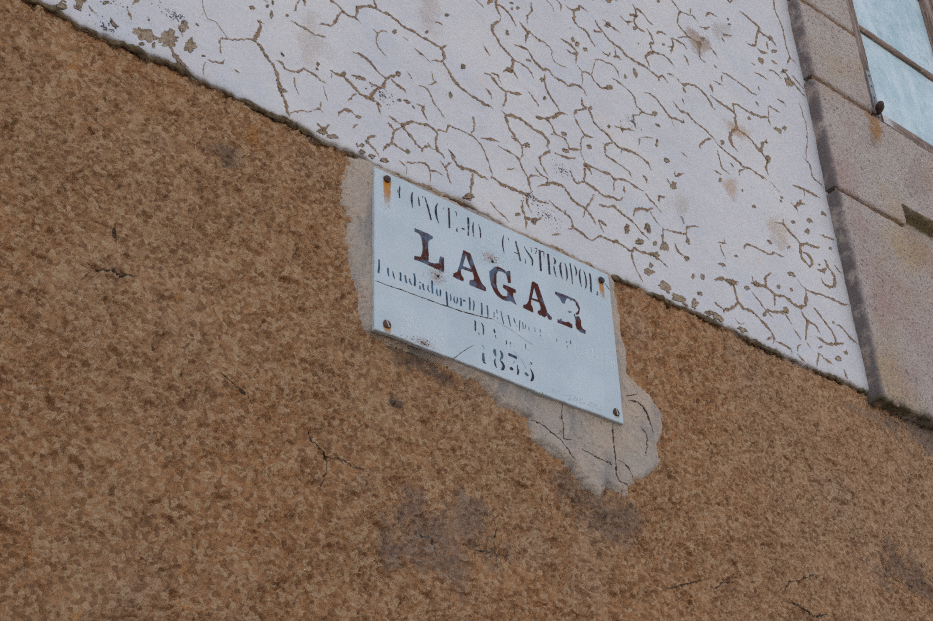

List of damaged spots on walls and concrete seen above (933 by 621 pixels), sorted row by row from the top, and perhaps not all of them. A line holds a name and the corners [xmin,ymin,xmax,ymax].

spalling [56,0,87,11]
spalling [132,17,205,57]
crack [153,0,856,378]
crack [88,263,139,278]
spalling [624,223,724,322]
crack [531,406,633,490]
crack [626,394,653,450]